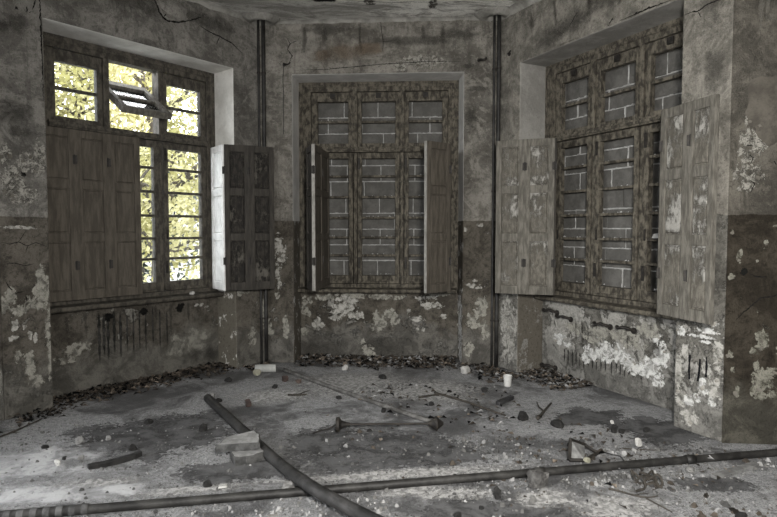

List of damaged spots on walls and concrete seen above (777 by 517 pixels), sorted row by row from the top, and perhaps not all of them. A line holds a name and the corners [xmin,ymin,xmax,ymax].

crack [15,0,44,97]
crack [560,0,670,45]
flaking render [732,116,769,193]
peeling [275,232,288,299]
peeling [728,248,748,280]
peeling [1,263,92,388]
damp [102,308,208,358]
peeling [247,297,290,346]
peeling [301,279,517,363]
damp [567,350,630,376]
peeling [553,321,735,427]
peeling [733,328,777,402]